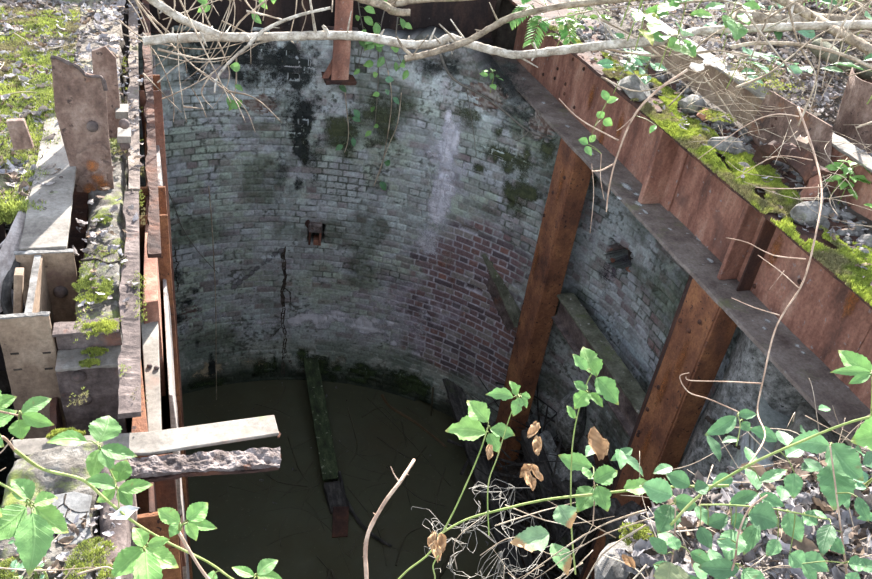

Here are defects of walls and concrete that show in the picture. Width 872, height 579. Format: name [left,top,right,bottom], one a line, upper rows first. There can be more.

damp [183,41,323,184]
efflorescence [416,110,466,254]
crack [273,246,292,377]
damp [296,348,432,402]